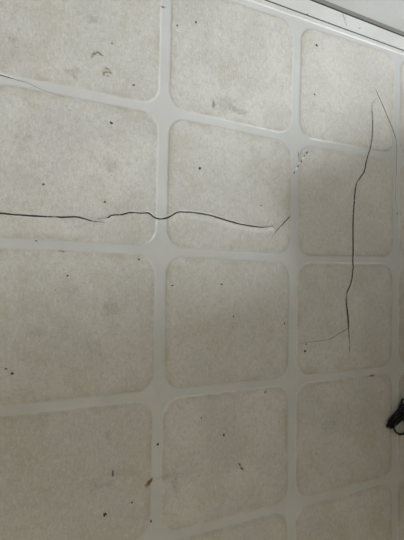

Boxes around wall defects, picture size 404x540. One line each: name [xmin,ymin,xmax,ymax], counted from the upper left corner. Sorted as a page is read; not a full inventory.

crack [0,210,290,234]
crack [306,91,398,351]